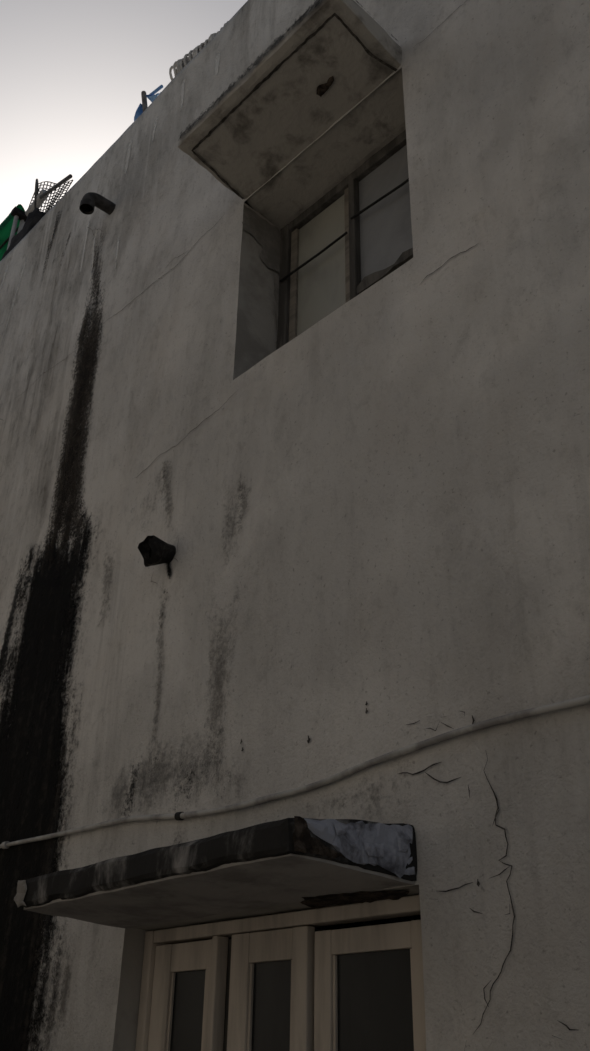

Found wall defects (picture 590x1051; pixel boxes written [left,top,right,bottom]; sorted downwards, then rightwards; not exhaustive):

leakage [0,225,103,1051]
crack [406,711,475,731]
crack [399,753,515,1050]